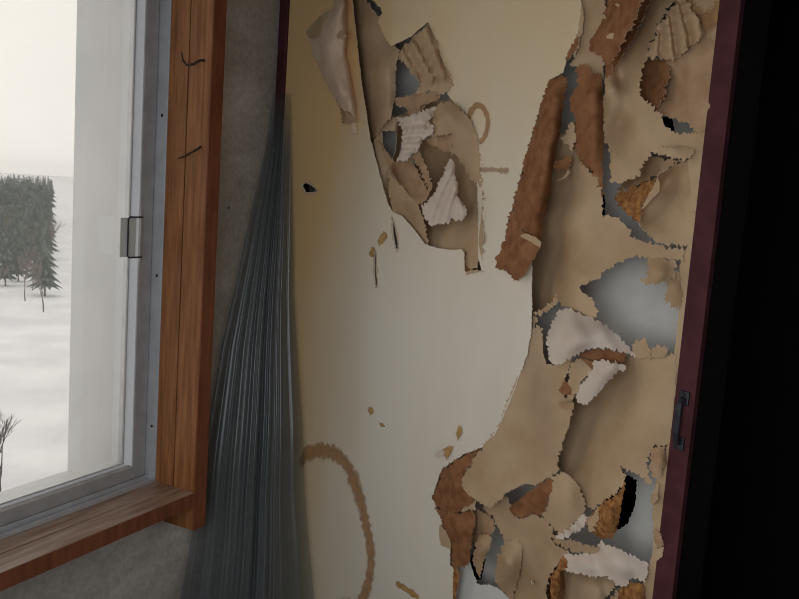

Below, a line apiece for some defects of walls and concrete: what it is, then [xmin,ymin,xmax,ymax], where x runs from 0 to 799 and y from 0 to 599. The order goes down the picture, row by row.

leakage [300,443,375,599]